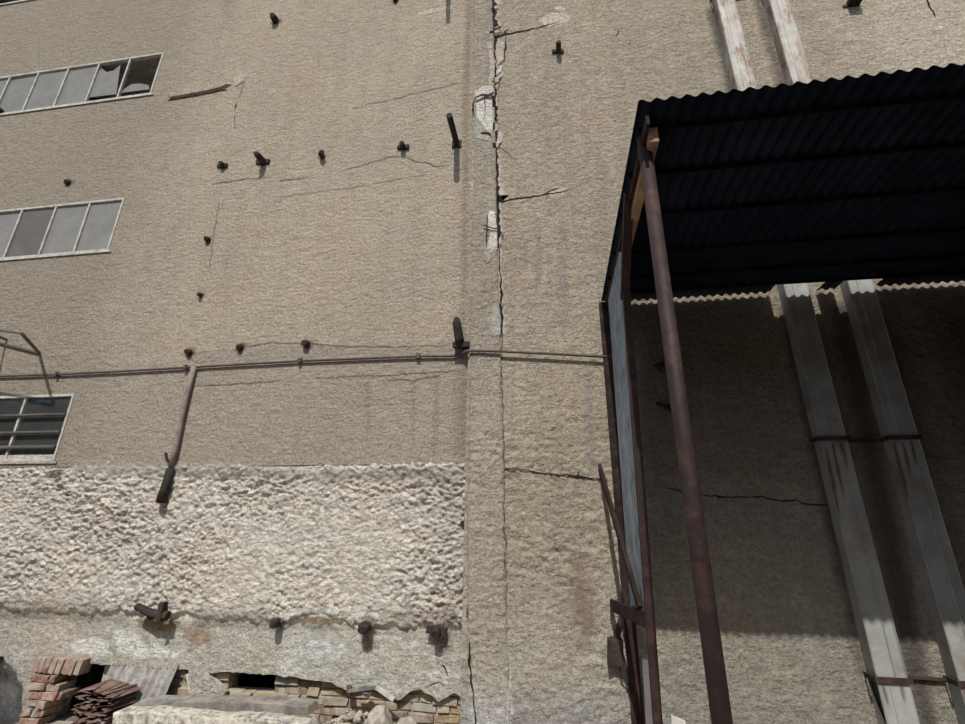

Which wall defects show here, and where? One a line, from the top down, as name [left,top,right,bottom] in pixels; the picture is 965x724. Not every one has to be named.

peeling [538,6,573,27]
spalling [471,0,507,264]
crack [484,0,601,609]
crack [668,488,826,506]
spalling [55,664,111,718]
spalling [166,669,193,695]
spalling [213,672,460,724]